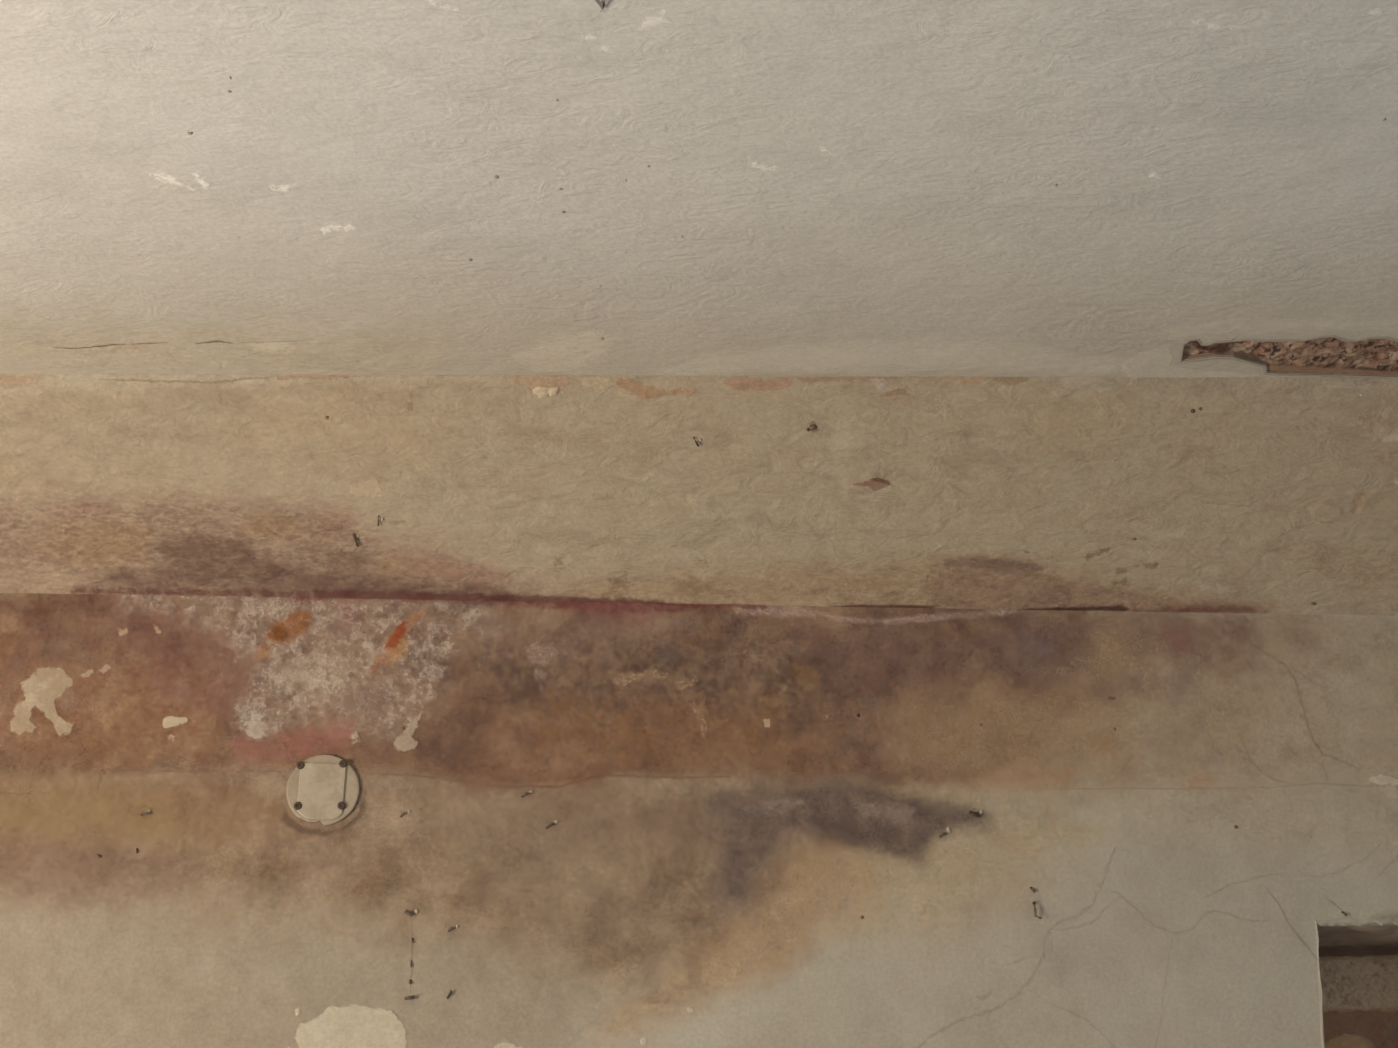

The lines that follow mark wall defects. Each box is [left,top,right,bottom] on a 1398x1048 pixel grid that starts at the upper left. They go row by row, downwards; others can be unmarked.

spalling [1179,335,1398,378]
rust [385,621,406,648]
peeling [10,664,111,736]
damp [0,538,1398,1048]
peeling [288,1004,407,1048]